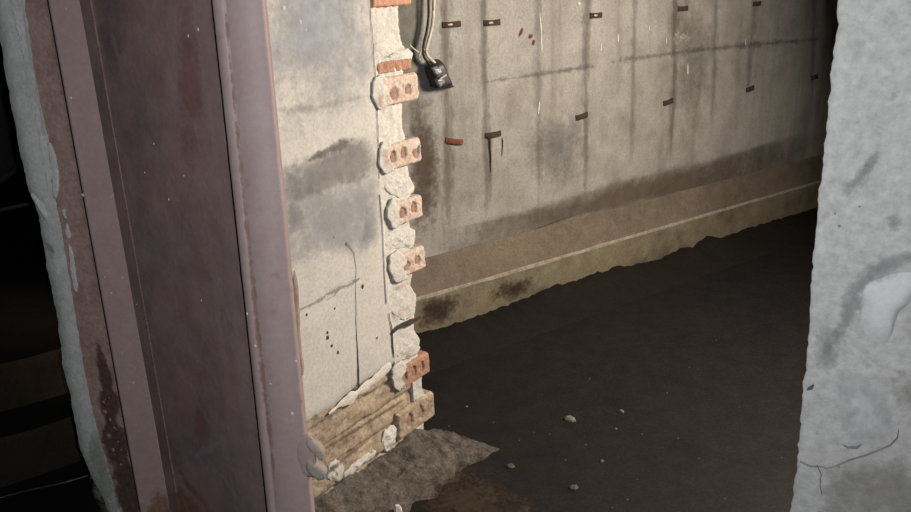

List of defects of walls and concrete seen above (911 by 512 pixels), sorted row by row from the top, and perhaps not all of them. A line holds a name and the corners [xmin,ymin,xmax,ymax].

leakage [412,115,436,221]
leakage [500,146,776,233]
spalling [307,0,435,500]
leakage [421,300,455,324]
leakage [497,280,527,296]
rust [97,345,139,512]
crack [800,429,899,494]